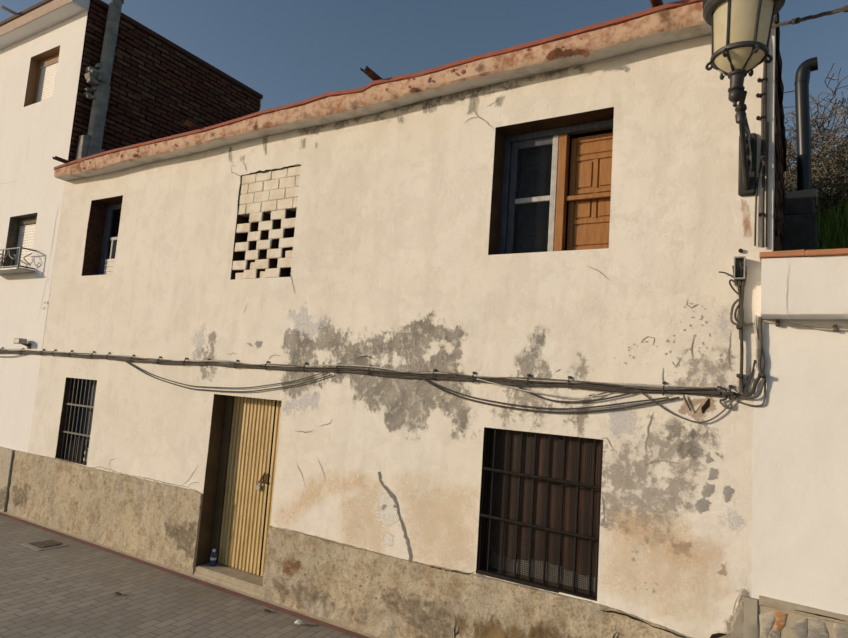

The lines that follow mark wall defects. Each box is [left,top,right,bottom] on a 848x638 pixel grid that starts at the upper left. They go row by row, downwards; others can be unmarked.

damp [394,81,517,122]
peeling [282,311,470,437]
peeling [516,330,552,379]
peeling [664,303,739,391]
peeling [570,398,592,434]
peeling [600,396,734,556]
crack [282,472,475,575]
damp [357,592,569,638]
crack [601,610,686,638]
crack [710,630,726,638]